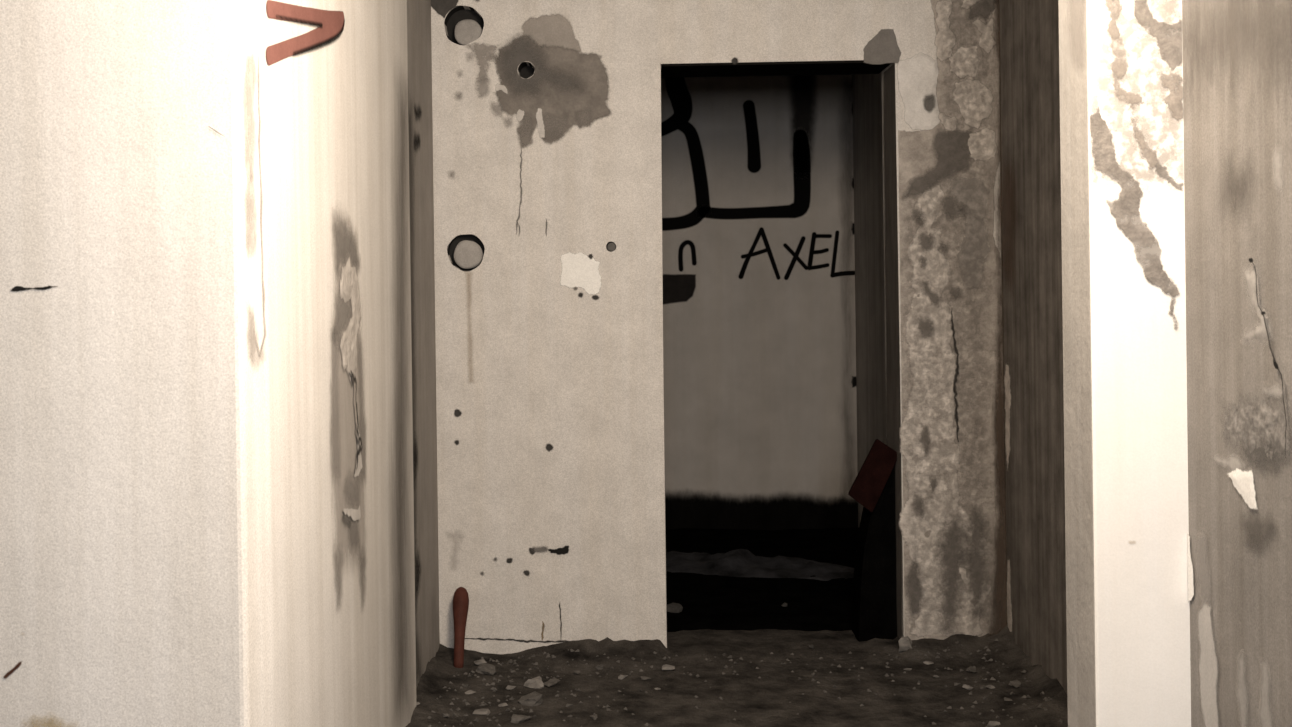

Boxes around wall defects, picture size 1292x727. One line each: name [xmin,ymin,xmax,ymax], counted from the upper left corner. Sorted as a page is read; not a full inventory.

damp [495,14,611,147]
spalling [863,29,901,64]
peeling [1106,0,1183,190]
peeling [1090,109,1179,329]
spalling [332,224,366,598]